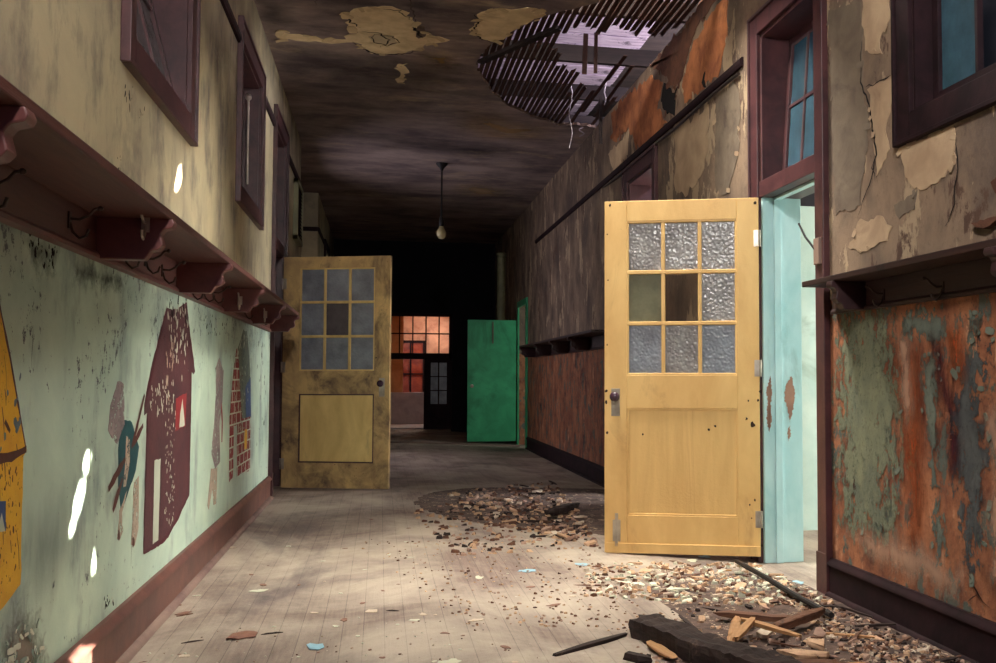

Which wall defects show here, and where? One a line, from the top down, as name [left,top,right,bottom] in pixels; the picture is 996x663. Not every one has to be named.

peeling [275,6,449,84]
peeling [469,7,547,45]
peeling [608,0,741,197]
peeling [826,0,957,253]
peeling [748,376,772,432]
peeling [784,376,795,441]
peeling [830,307,996,587]